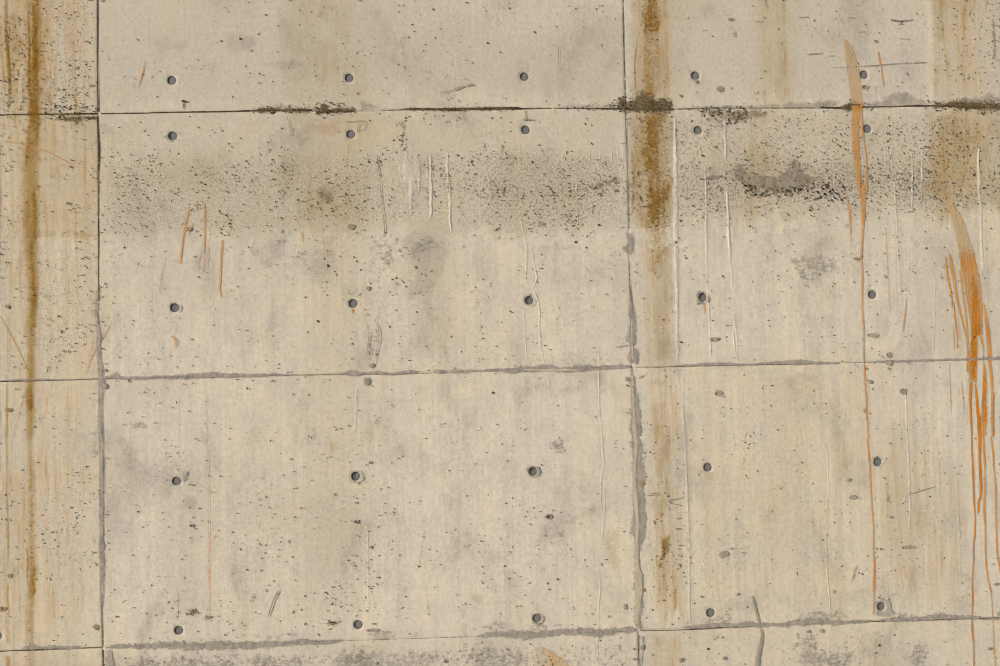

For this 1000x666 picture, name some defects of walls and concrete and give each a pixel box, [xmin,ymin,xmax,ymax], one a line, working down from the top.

water stain [397,120,432,216]
corrosion [632,114,671,234]
water stain [732,161,849,202]
corrosion [844,39,868,261]
corrosion [898,124,1000,666]
corrosion [865,400,875,614]